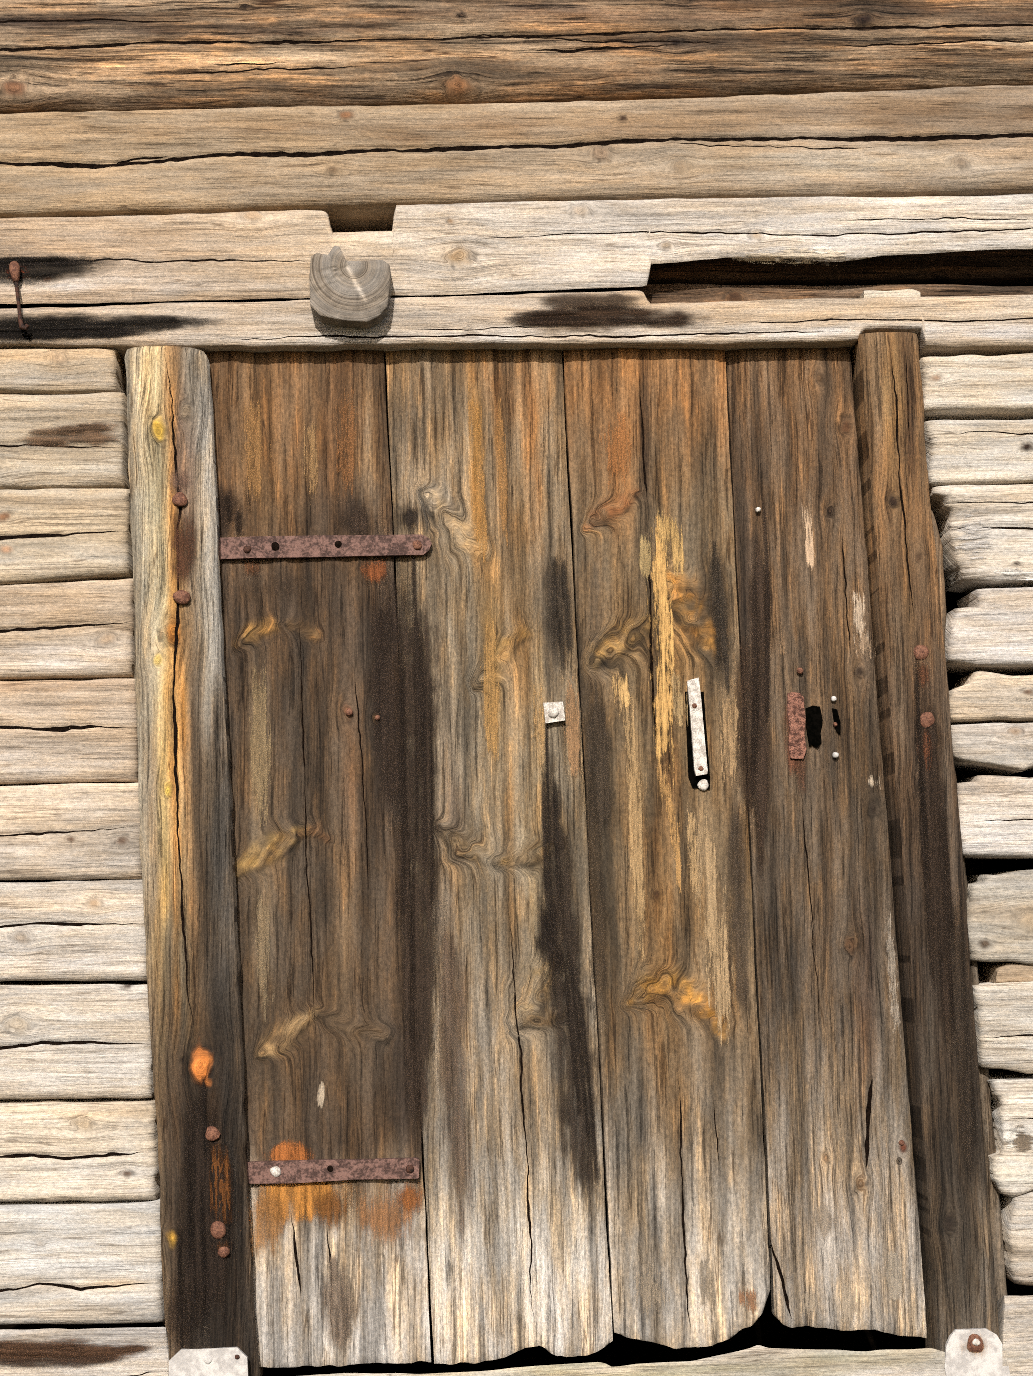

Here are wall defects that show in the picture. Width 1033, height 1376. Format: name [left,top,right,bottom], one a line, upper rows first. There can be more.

crack [0,133,1033,169]
crack [165,347,182,527]
crack [0,622,126,633]
crack [0,724,121,732]
crack [172,578,194,1034]
crack [0,826,134,836]
crack [0,921,144,929]
crack [865,1078,873,1168]
corrosion [271,1142,307,1161]
corrosion [210,1152,230,1220]
corrosion [255,1181,420,1246]